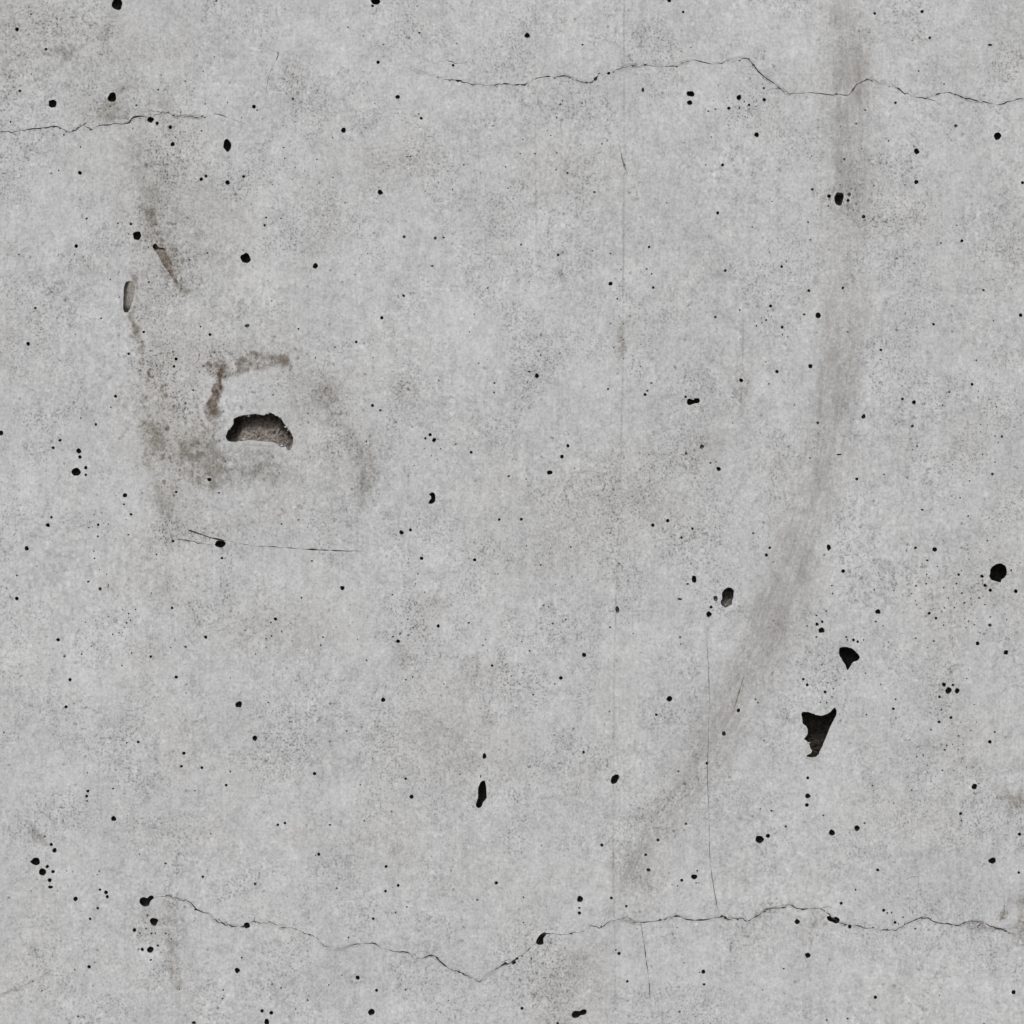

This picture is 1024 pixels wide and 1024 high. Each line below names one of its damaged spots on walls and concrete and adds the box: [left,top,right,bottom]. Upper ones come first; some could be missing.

crack [418,58,1022,105]
crack [1,109,248,133]
spalling [226,412,293,454]
spalling [839,647,860,670]
spalling [801,708,837,761]
crack [161,628,1014,1006]